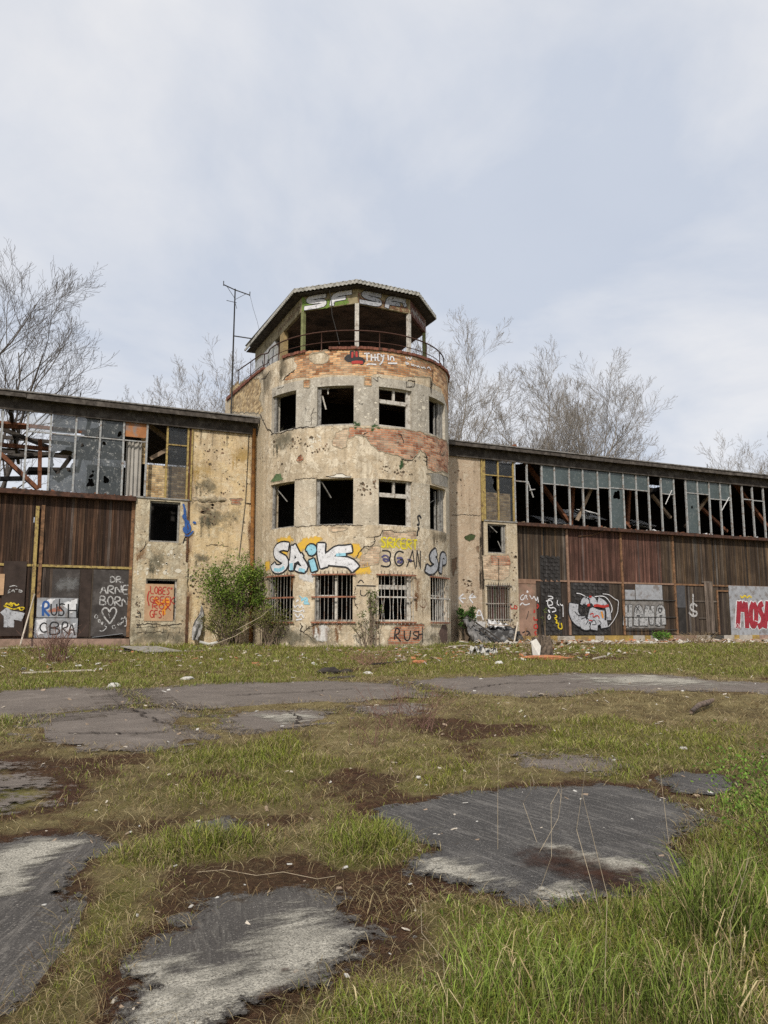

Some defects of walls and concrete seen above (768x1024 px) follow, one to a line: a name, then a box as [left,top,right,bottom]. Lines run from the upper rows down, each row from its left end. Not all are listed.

peeling [270,349,465,571]
peeling [451,534,517,628]